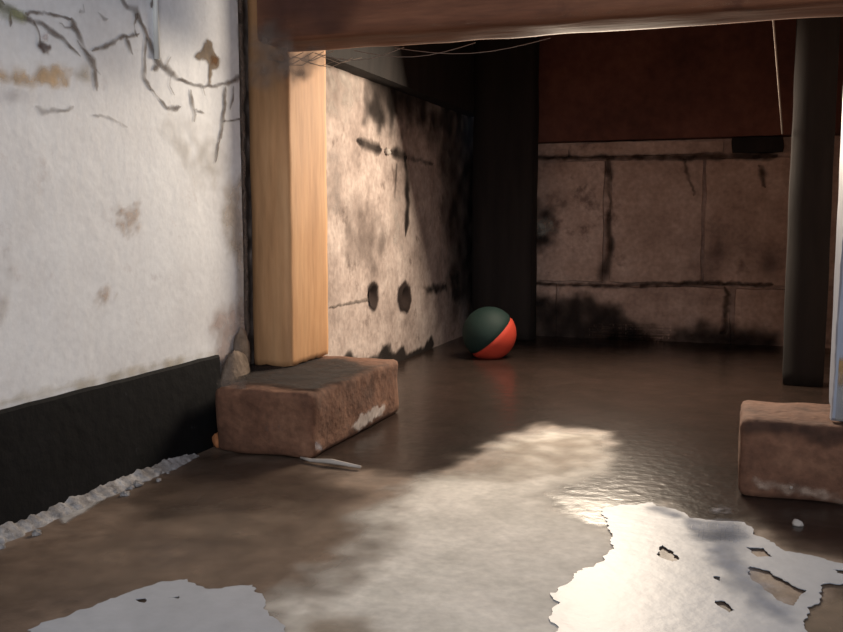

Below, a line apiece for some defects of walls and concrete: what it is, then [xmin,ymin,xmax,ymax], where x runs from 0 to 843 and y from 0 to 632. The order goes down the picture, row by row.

rust [0,66,67,86]
crack [0,0,242,161]
rust [195,40,219,83]
water stain [328,69,353,106]
water stain [215,0,253,373]
crack [357,138,410,235]
water stain [366,80,474,309]
crack [537,153,778,334]
water stain [133,453,357,518]
water stain [316,295,843,555]